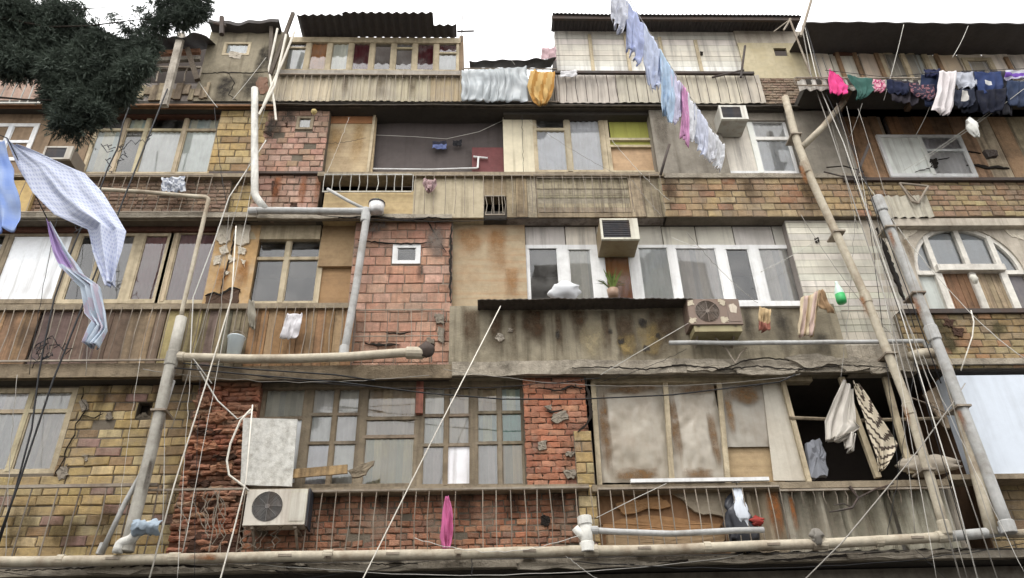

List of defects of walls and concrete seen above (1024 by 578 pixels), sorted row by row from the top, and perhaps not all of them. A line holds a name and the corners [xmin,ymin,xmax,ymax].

leakage [217,48,275,96]
flaking render [205,224,251,304]
spalling [136,406,152,420]
spalling [187,397,238,518]
peeling [544,405,569,424]
leakage [600,386,654,457]
leakage [618,469,655,479]
leakage [670,403,681,447]
leakage [708,418,720,459]
crack [543,357,888,432]
spalling [186,532,290,572]